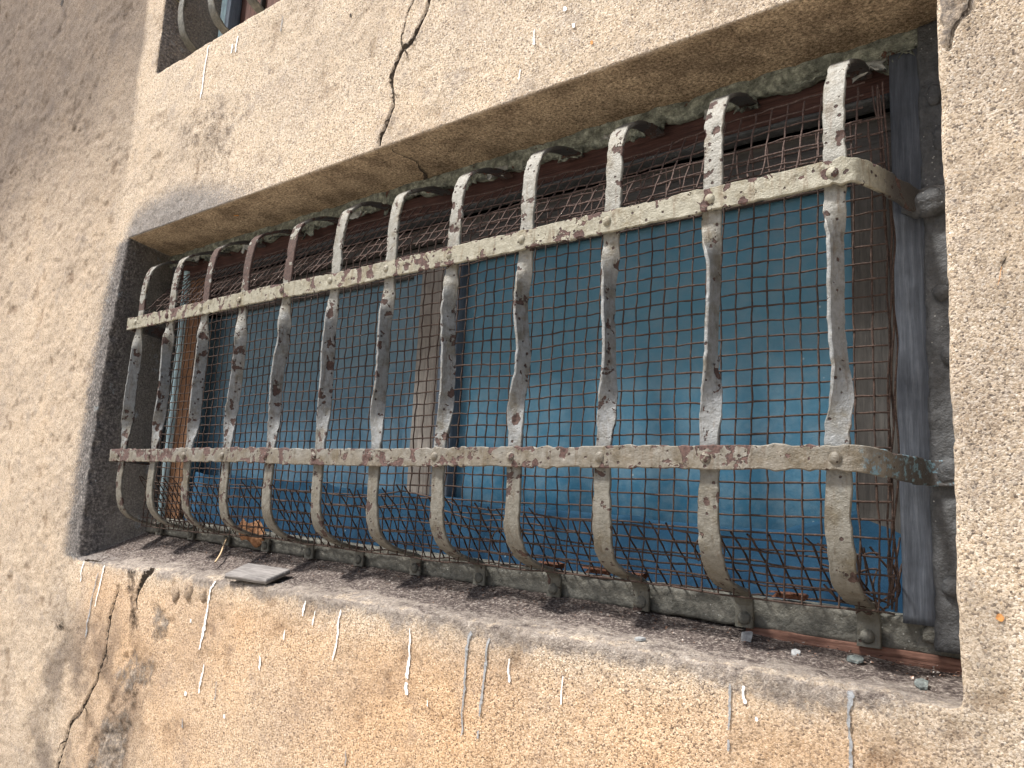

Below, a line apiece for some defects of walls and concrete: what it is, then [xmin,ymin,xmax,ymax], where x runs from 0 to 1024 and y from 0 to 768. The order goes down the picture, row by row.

crack [379,0,431,180]
leakage [198,581,216,650]
crack [56,568,155,768]
leakage [727,684,747,752]
leakage [846,691,855,768]